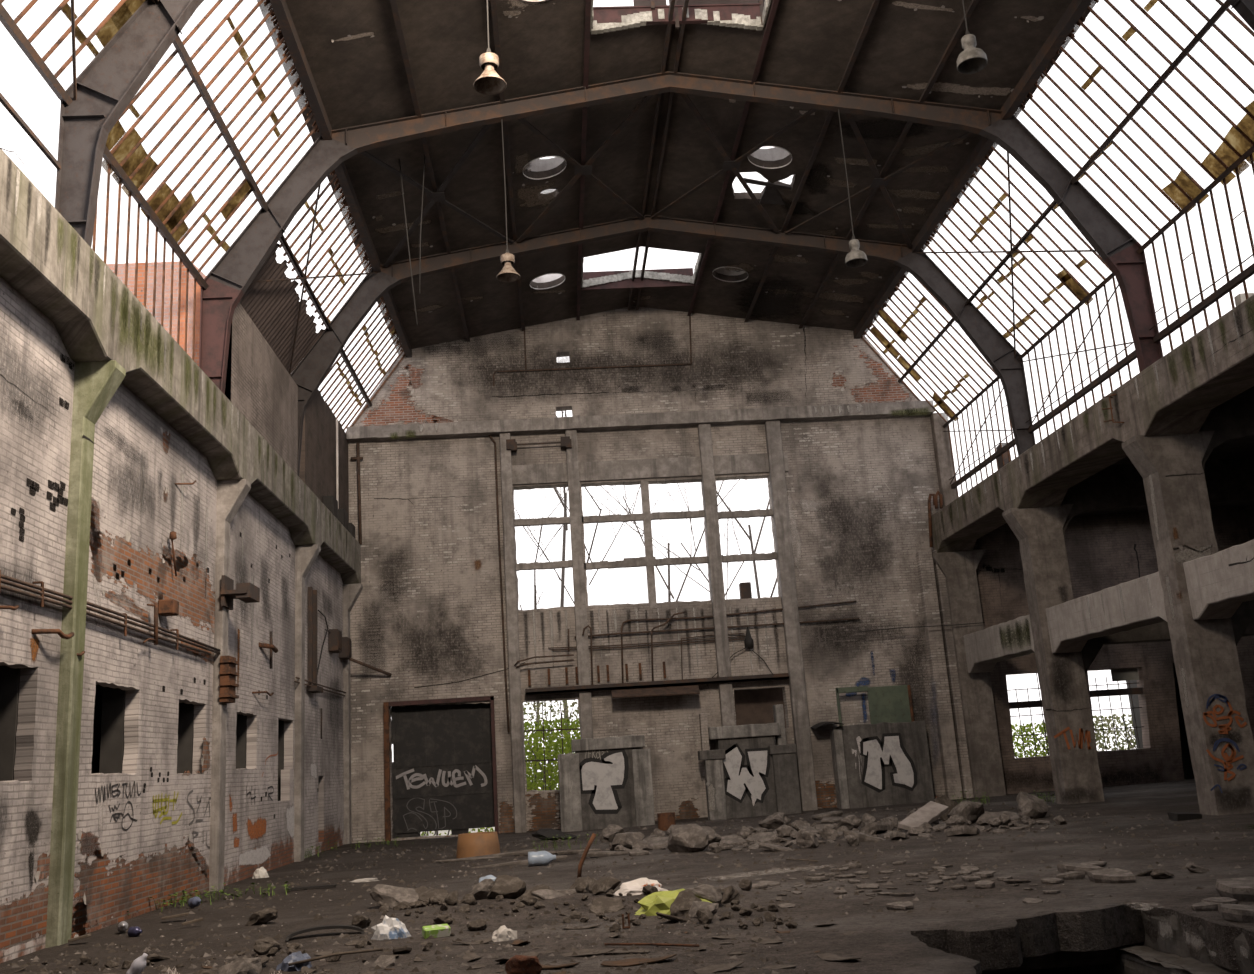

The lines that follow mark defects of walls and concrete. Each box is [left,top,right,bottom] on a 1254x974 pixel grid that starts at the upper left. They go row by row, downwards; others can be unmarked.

water stain [7,161,50,248]
water stain [71,233,174,379]
peeling [160,427,170,454]
water stain [194,367,250,431]
peeling [361,364,458,426]
peeling [828,345,912,403]
water stain [93,511,101,623]
peeling [89,497,215,666]
water stain [118,454,208,578]
peeling [0,849,50,958]
peeling [71,830,209,938]